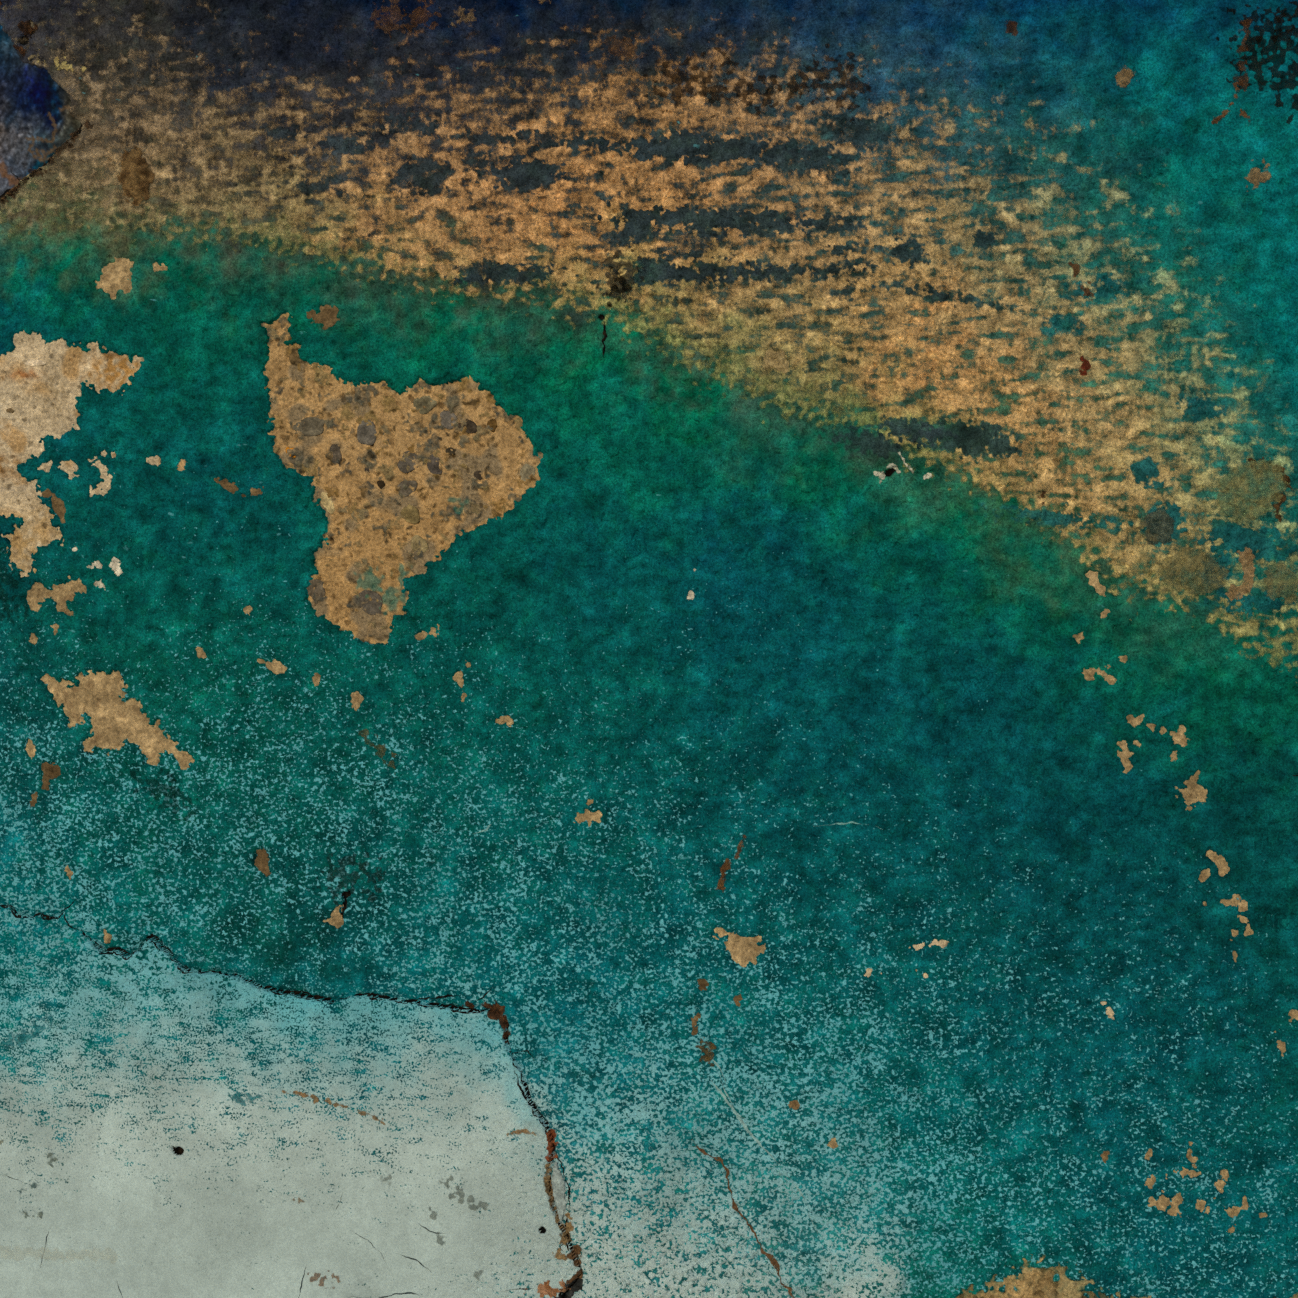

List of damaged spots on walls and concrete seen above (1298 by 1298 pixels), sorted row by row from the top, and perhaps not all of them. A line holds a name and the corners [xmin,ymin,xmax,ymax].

peeling [0,15,1298,667]
peeling [453,660,471,702]
peeling [1082,655,1127,685]
spalling [40,670,195,770]
peeling [1117,714,1188,774]
peeling [1175,770,1208,811]
peeling [1199,850,1230,882]
peeling [1203,894,1254,962]
crack [0,900,582,1298]
spalling [553,1278,583,1298]
spalling [955,1254,1151,1298]